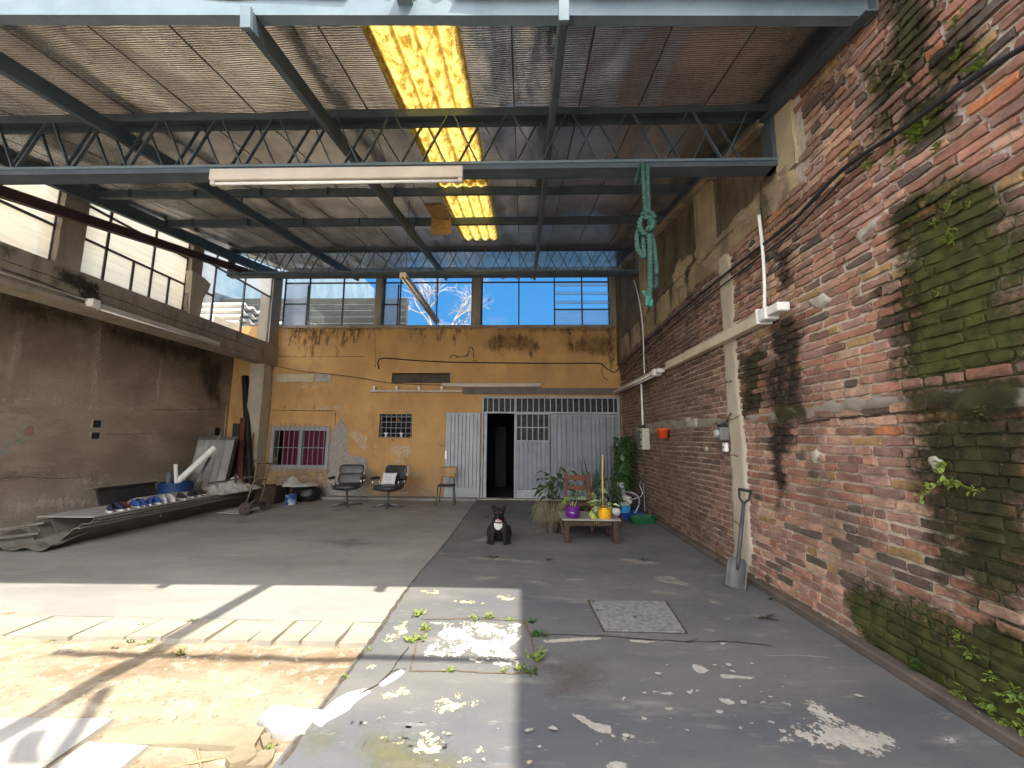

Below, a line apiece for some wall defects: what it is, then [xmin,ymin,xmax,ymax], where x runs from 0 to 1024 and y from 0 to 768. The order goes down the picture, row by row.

water stain [875,270,926,338]
water stain [737,345,806,423]
water stain [906,377,1023,415]
peeling [317,405,378,496]
peeling [423,621,522,667]
peeling [777,700,903,758]